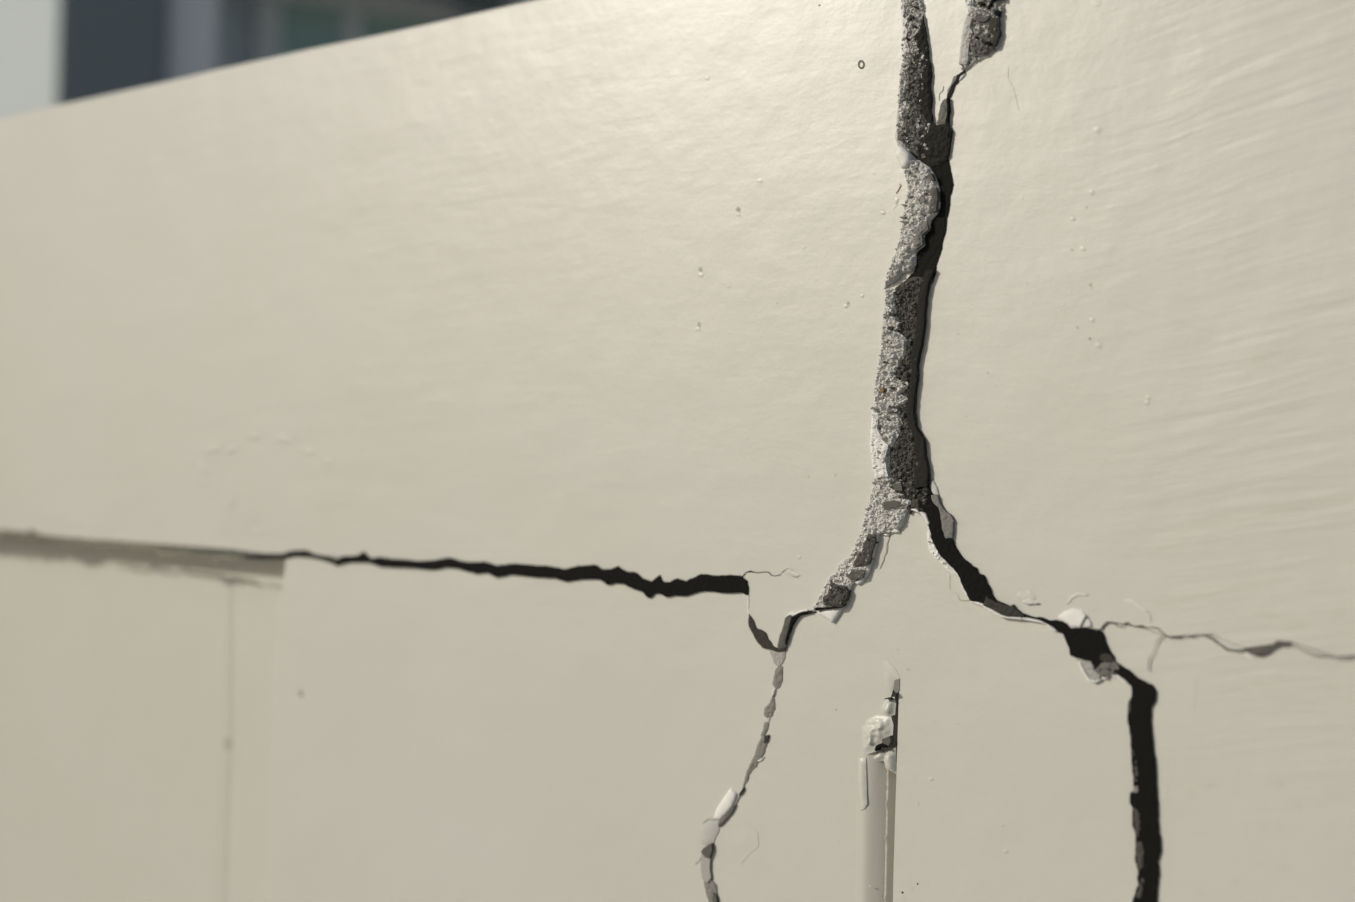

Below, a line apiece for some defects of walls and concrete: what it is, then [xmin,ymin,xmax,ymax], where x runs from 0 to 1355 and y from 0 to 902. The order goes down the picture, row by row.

crack [0,529,195,558]
crack [238,550,812,902]
spalling [785,0,1092,631]
crack [905,16,1246,902]
crack [1291,643,1355,659]